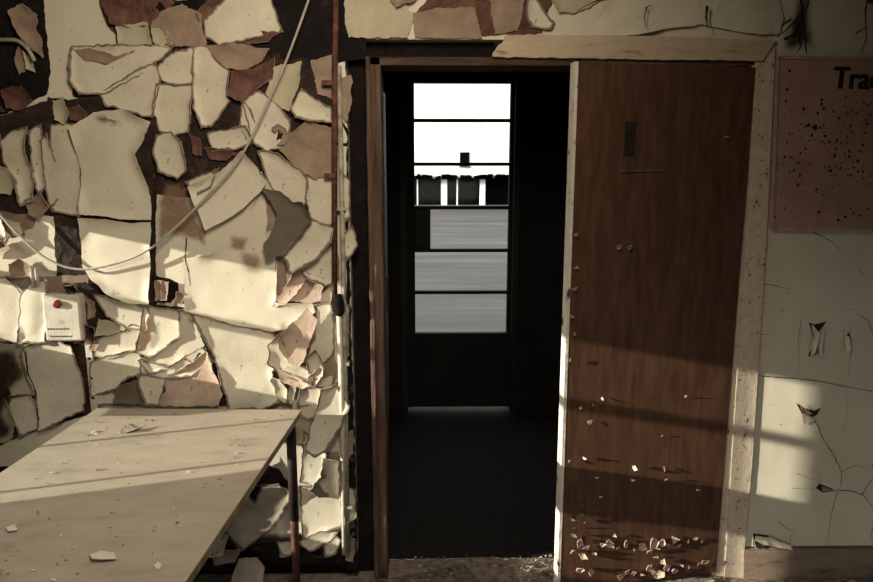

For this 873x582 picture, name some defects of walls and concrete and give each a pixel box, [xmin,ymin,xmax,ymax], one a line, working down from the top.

crack [856,1,868,53]
peeling [0,0,600,570]
peeling [797,404,821,425]
crack [758,308,873,427]
peeling [809,321,826,357]
crack [794,415,873,542]